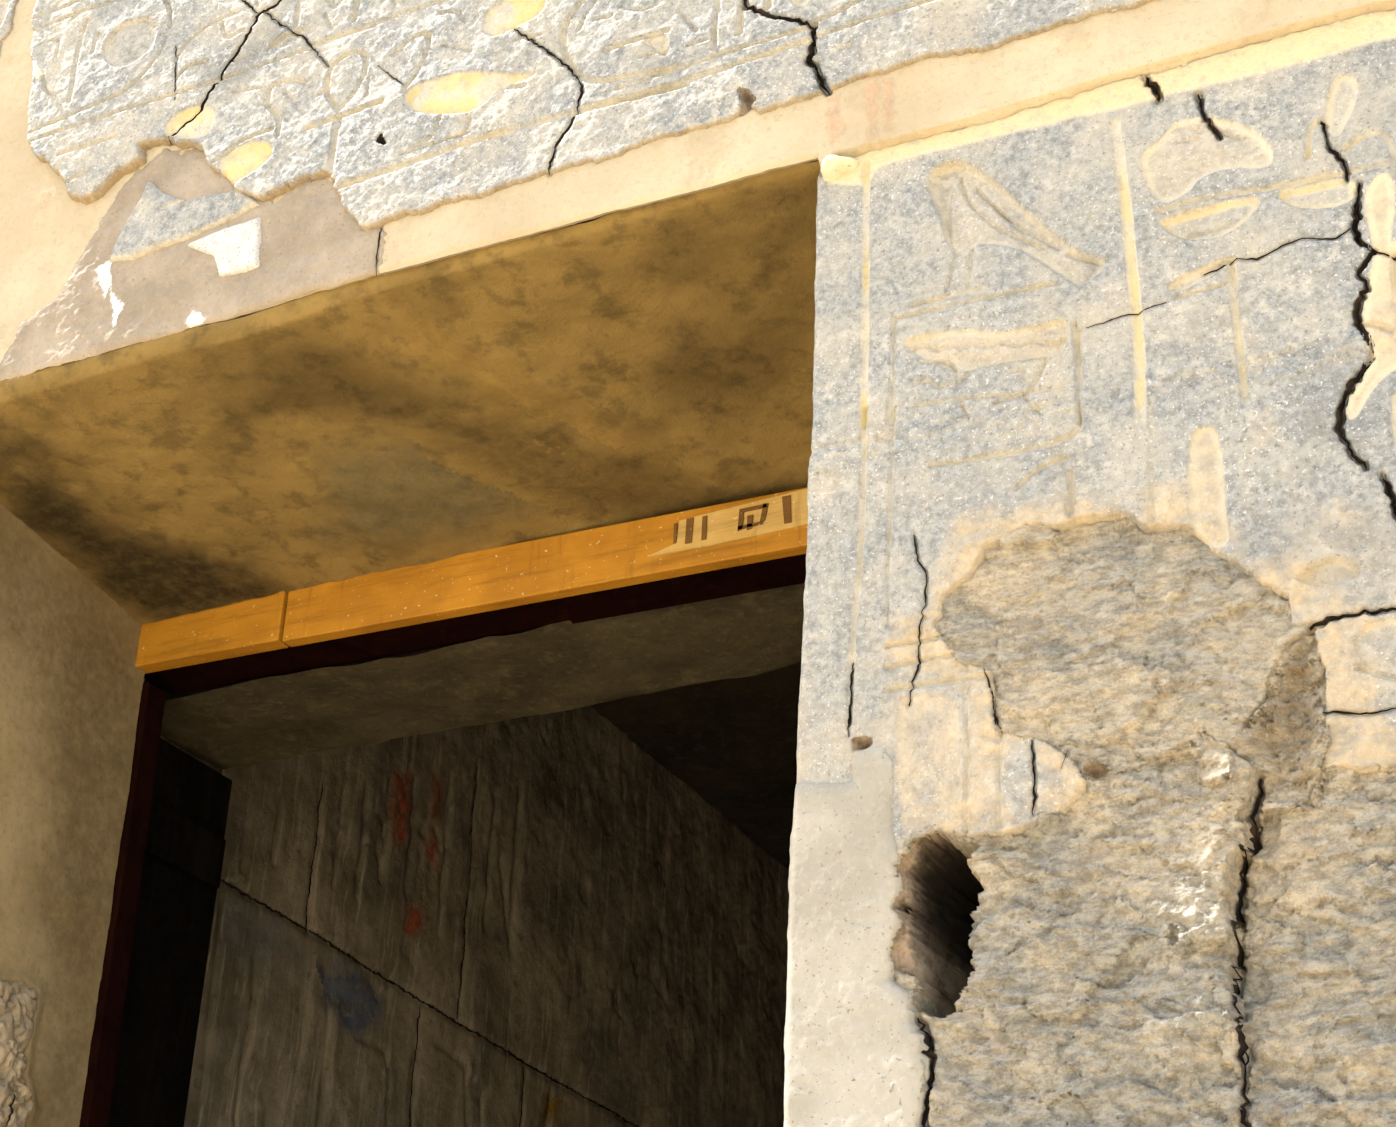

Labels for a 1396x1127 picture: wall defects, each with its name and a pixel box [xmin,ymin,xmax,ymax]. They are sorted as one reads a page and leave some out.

crack [168,0,329,143]
crack [514,28,583,175]
crack [743,0,830,95]
crack [1145,76,1161,102]
crack [1198,94,1221,141]
crack [1087,302,1166,328]
crack [1204,121,1396,516]
crack [1309,607,1396,631]
crack [1323,707,1396,715]
spalling [890,518,1396,1127]
crack [1231,778,1264,1127]
crack [917,1018,935,1127]